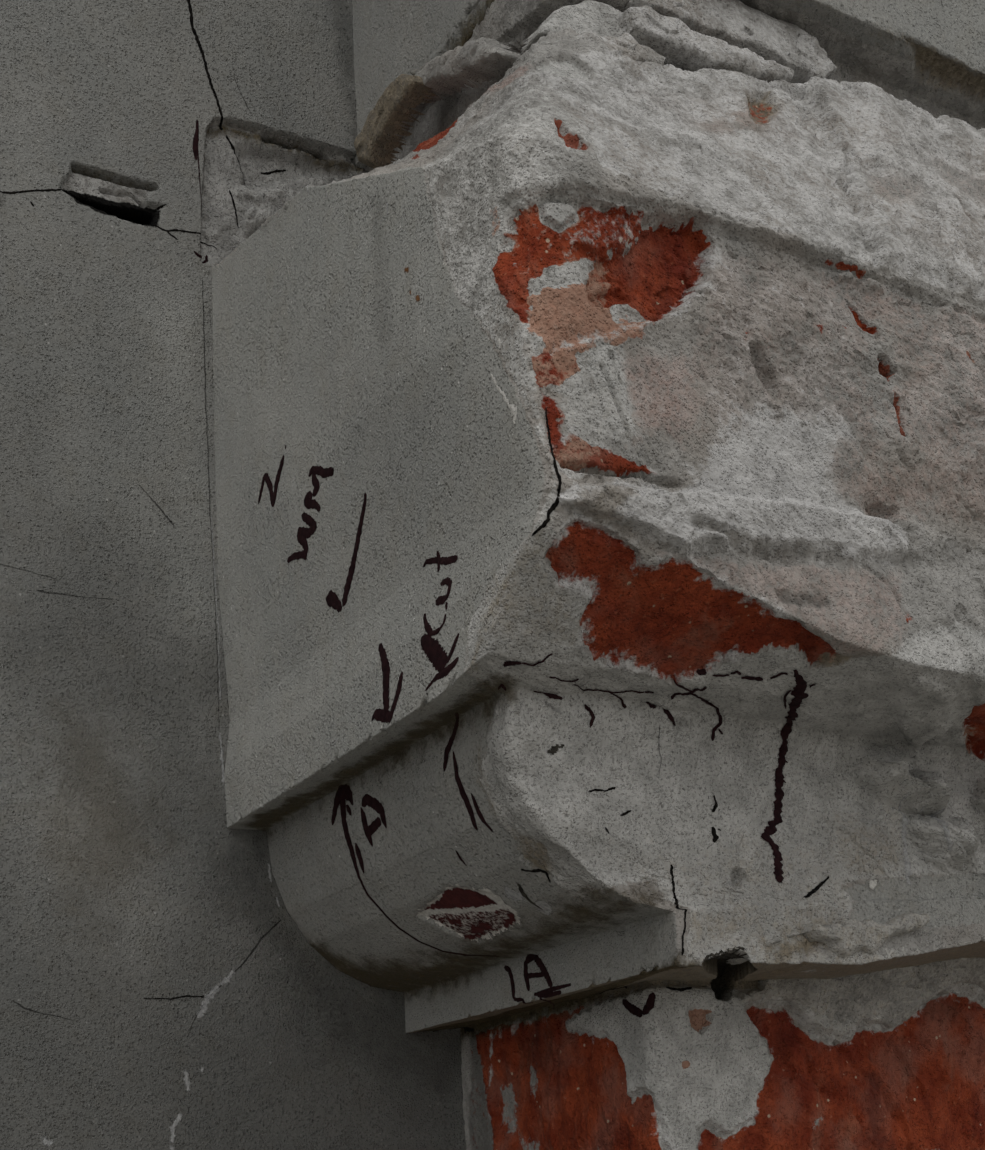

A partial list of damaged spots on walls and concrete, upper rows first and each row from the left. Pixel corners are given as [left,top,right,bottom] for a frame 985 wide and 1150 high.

crack [187,0,286,228]
crack [0,189,61,206]
spalling [60,166,163,226]
crack [152,204,217,249]
spalling [200,0,985,684]
crack [532,408,562,536]
flaking render [959,701,985,761]
crack [498,653,829,898]
peeling [417,883,552,942]
crack [144,993,204,1001]
peeling [565,952,775,1150]